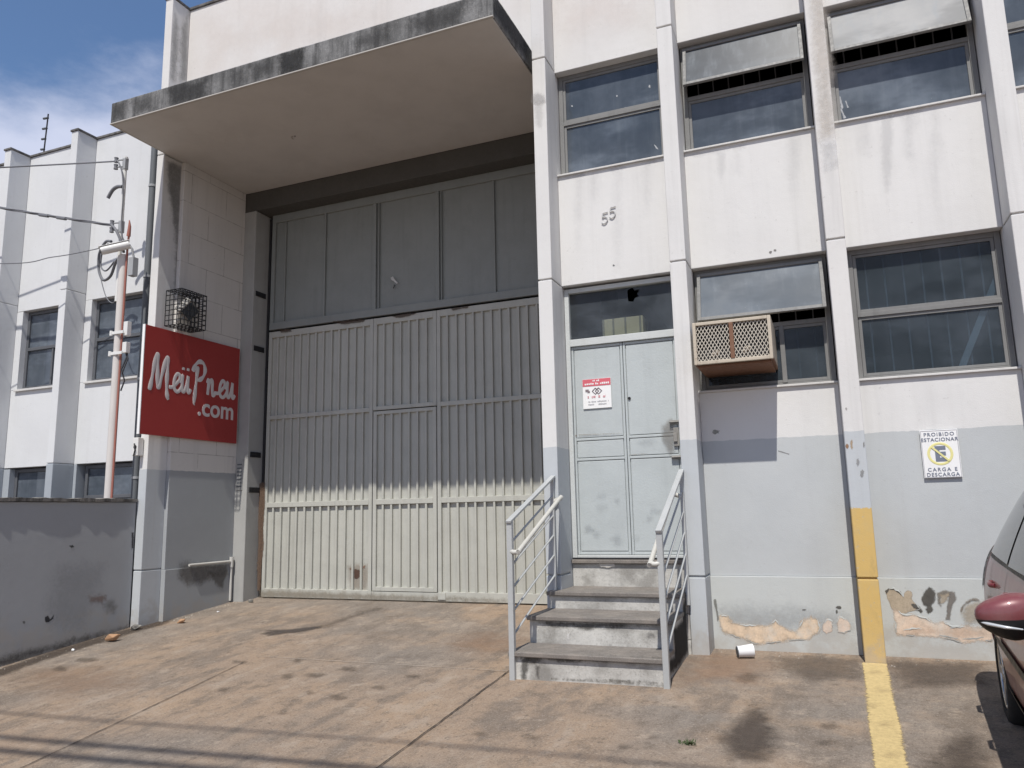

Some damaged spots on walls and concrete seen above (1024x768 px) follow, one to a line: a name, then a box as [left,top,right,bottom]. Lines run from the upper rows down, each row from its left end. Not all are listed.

water stain [255,51,302,75]
water stain [169,79,205,104]
water stain [180,565,226,586]
peeling [714,599,852,645]
peeling [885,587,993,644]